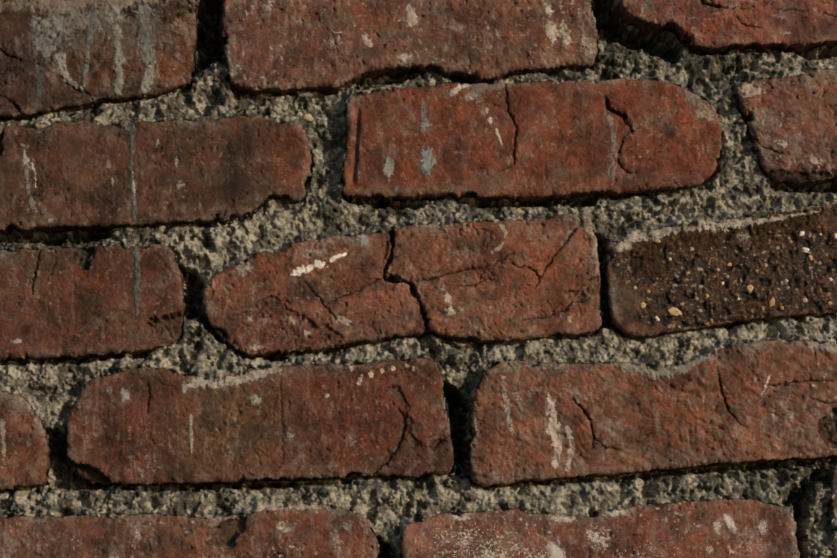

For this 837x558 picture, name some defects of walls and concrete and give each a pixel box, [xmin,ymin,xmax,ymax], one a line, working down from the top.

crack [497,92,518,172]
crack [605,101,663,174]
crack [307,229,583,331]
spalling [611,204,837,331]
crack [374,410,409,474]
efflorescence [429,513,566,558]
efflorescence [586,508,629,550]
efflorescence [713,513,770,555]